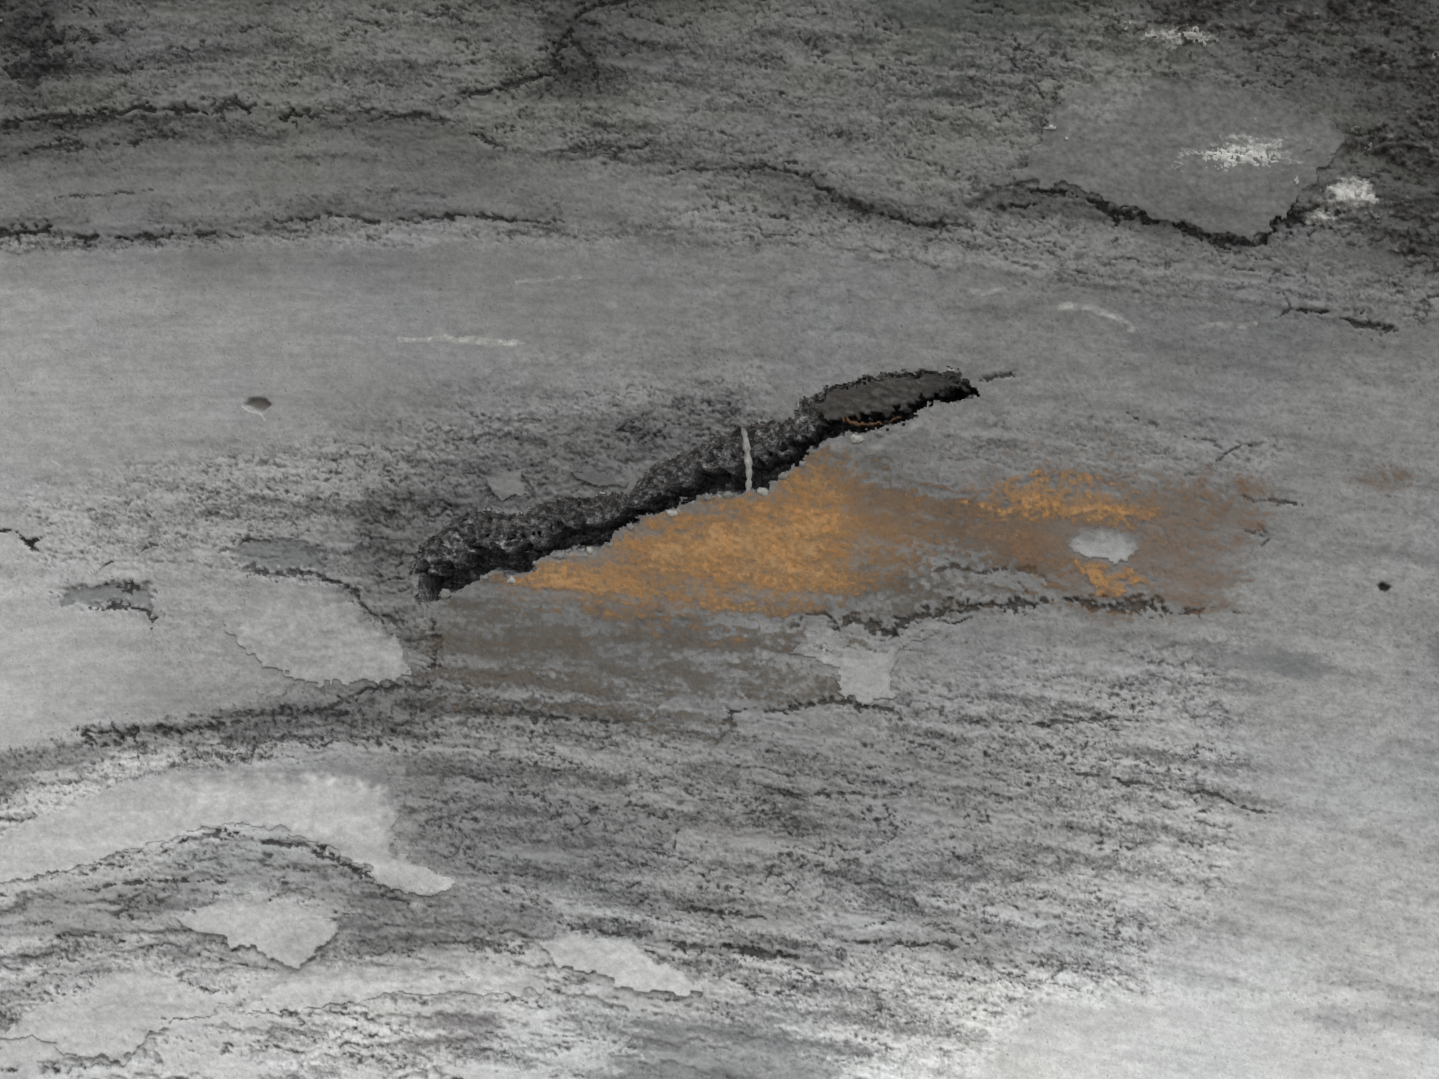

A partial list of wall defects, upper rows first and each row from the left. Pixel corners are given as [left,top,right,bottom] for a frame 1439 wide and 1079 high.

crack [1,96,314,155]
crack [358,0,628,151]
crack [0,189,565,247]
crack [555,141,1398,333]
peeling [486,463,529,501]
corrosion [509,452,1267,620]
spalling [65,580,157,630]
peeling [222,577,416,689]
peeling [0,764,455,896]
peeling [0,893,545,1066]
peeling [539,929,704,997]